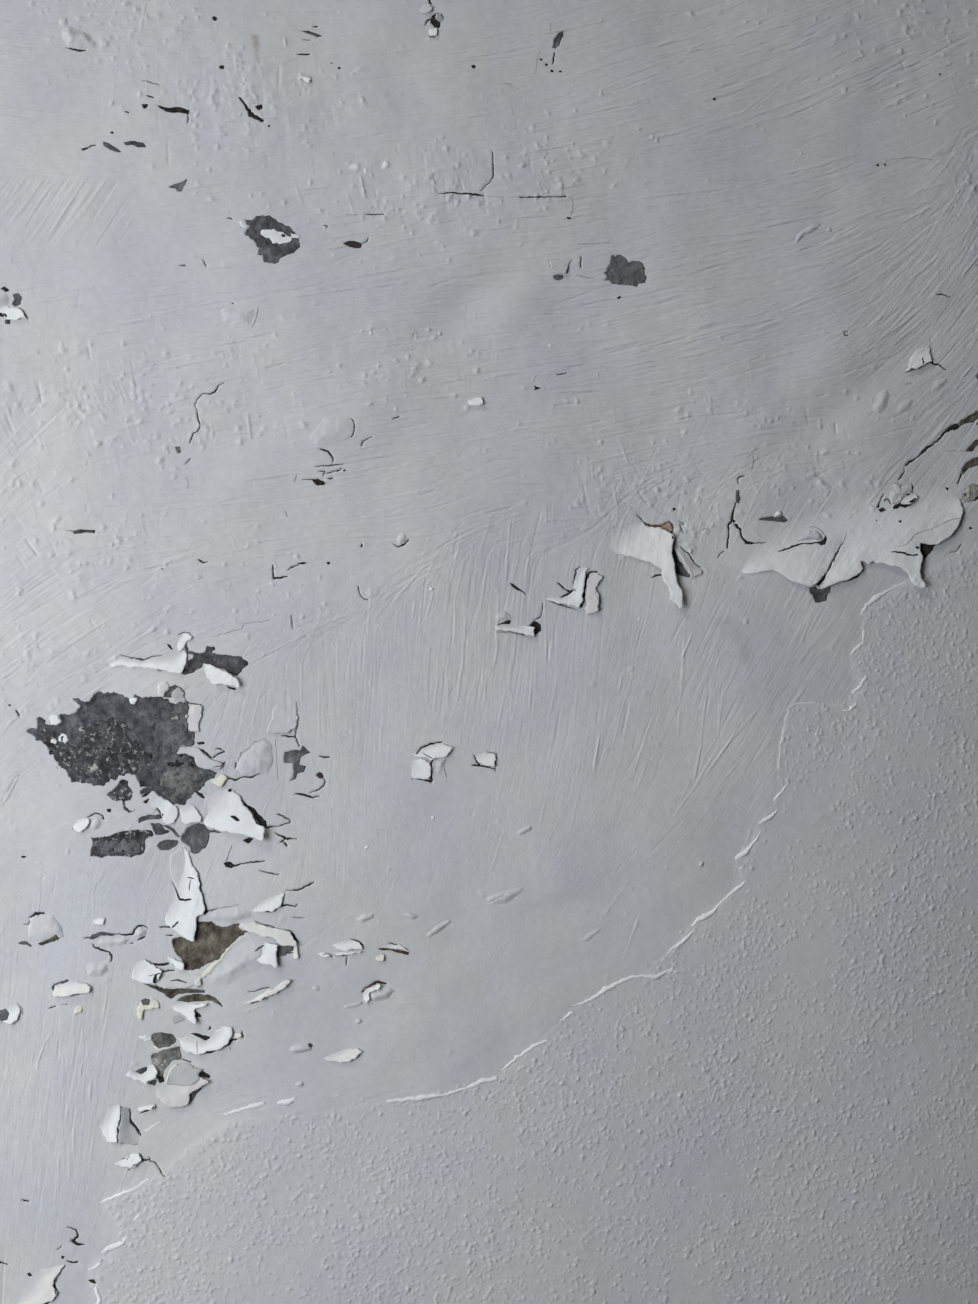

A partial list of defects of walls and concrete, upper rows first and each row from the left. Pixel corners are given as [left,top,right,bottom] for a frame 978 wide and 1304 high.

spalling [228,215,300,264]
peeling [906,340,946,384]
peeling [609,508,702,609]
peeling [742,482,978,603]
peeling [495,567,603,637]
spalling [26,632,314,1177]
peeling [375,943,409,961]
peeling [0,1003,23,1025]
peeling [344,980,395,1008]
peeling [324,1048,362,1063]
peeling [18,1227,84,1304]